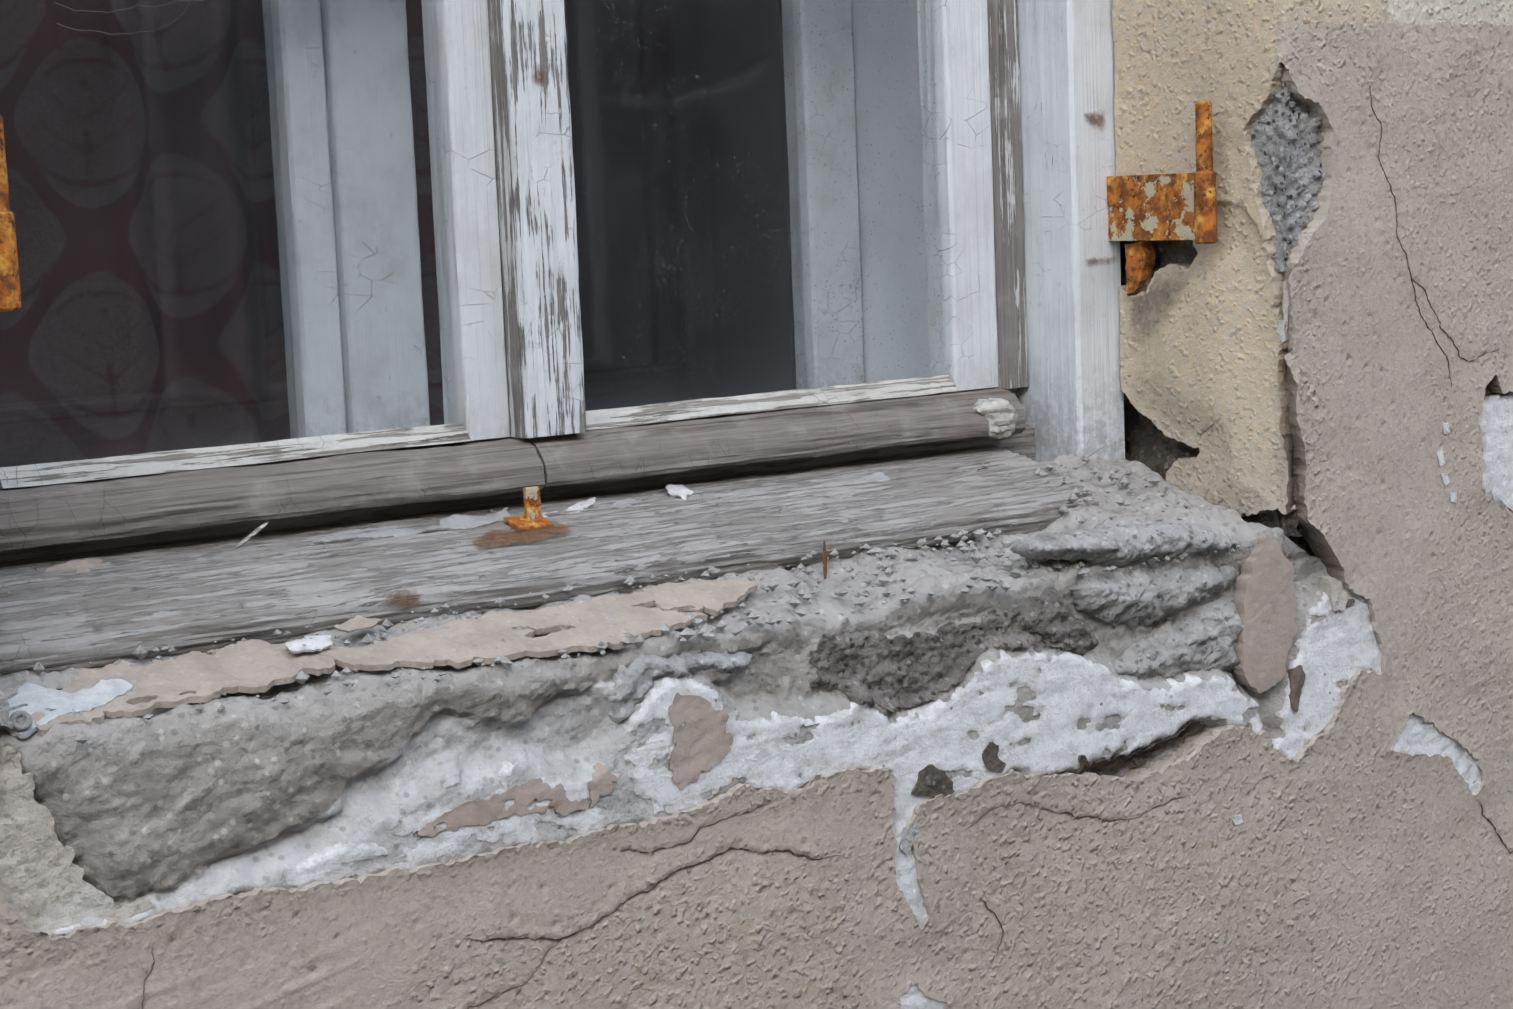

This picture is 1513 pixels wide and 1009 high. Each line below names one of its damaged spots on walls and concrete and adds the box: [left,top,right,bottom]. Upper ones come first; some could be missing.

spalling [1249,82,1325,343]
crack [1370,93,1500,386]
peeling [44,558,105,573]
rust [473,523,568,546]
peeling [542,484,694,517]
spalling [1124,393,1200,481]
spalling [1478,386,1513,513]
peeling [0,578,758,938]
peeling [283,507,1382,928]
peeling [1390,714,1481,794]
crack [464,777,842,1009]
peeling [900,984,947,1009]